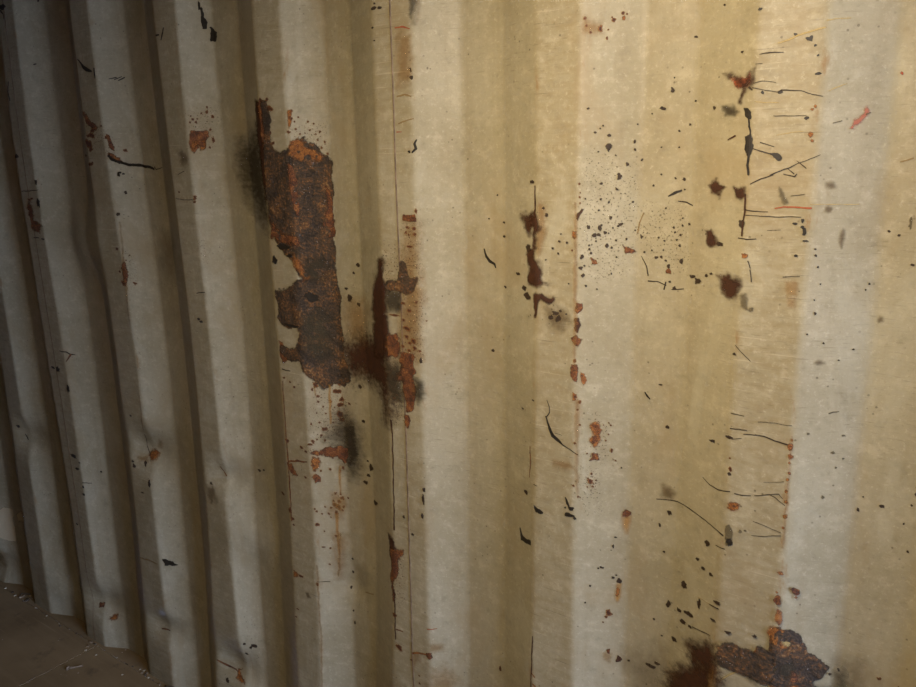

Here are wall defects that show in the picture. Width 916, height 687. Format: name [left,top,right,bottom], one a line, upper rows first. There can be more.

rust [189,106,216,153]
rust [516,180,583,346]
rust [551,125,753,312]
rust [258,98,433,661]
rust [570,359,587,385]
peeling [0,507,25,542]
rust [665,591,840,687]